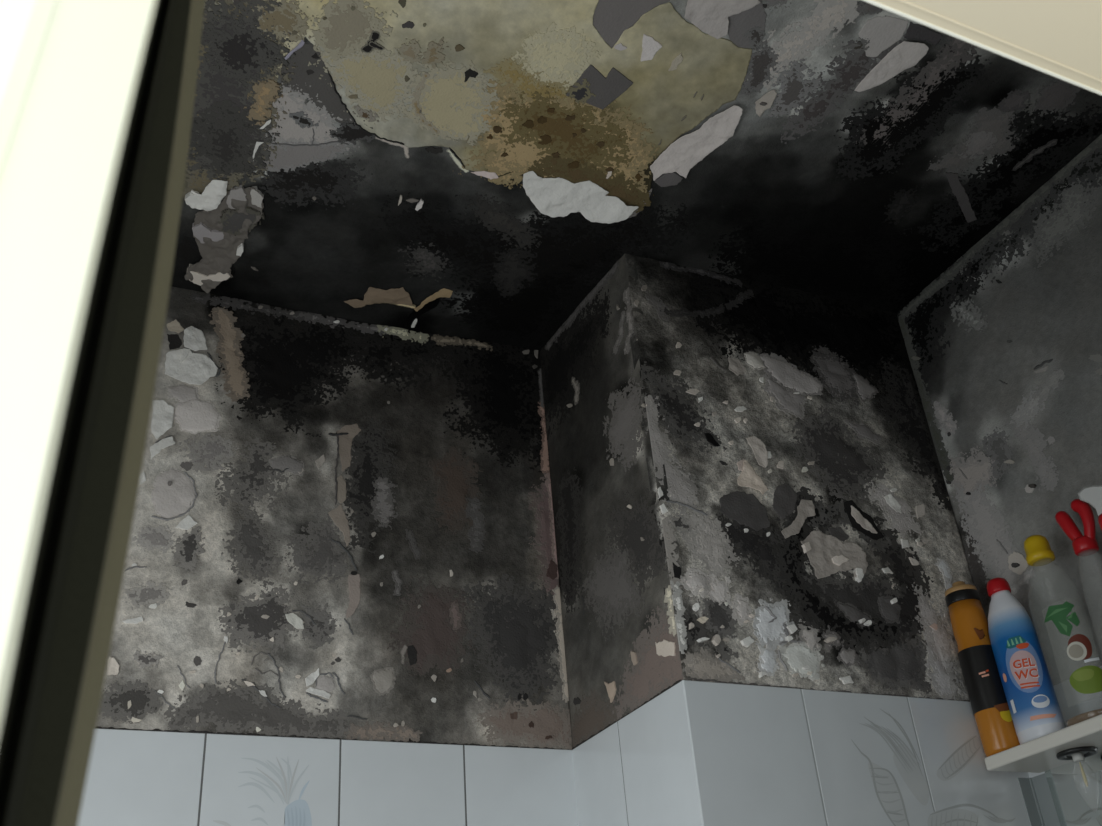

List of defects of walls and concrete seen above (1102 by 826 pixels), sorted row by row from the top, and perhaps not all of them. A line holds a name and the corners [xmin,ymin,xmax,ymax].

damp [183,0,605,200]
peeling [273,0,777,224]
damp [741,0,882,128]
peeling [854,16,943,92]
peeling [182,166,264,293]
peeling [165,306,251,402]
peeling [344,287,453,328]
damp [645,79,1102,608]
damp [174,432,367,661]
damp [602,366,965,700]
peeling [719,436,884,583]
damp [99,650,358,739]